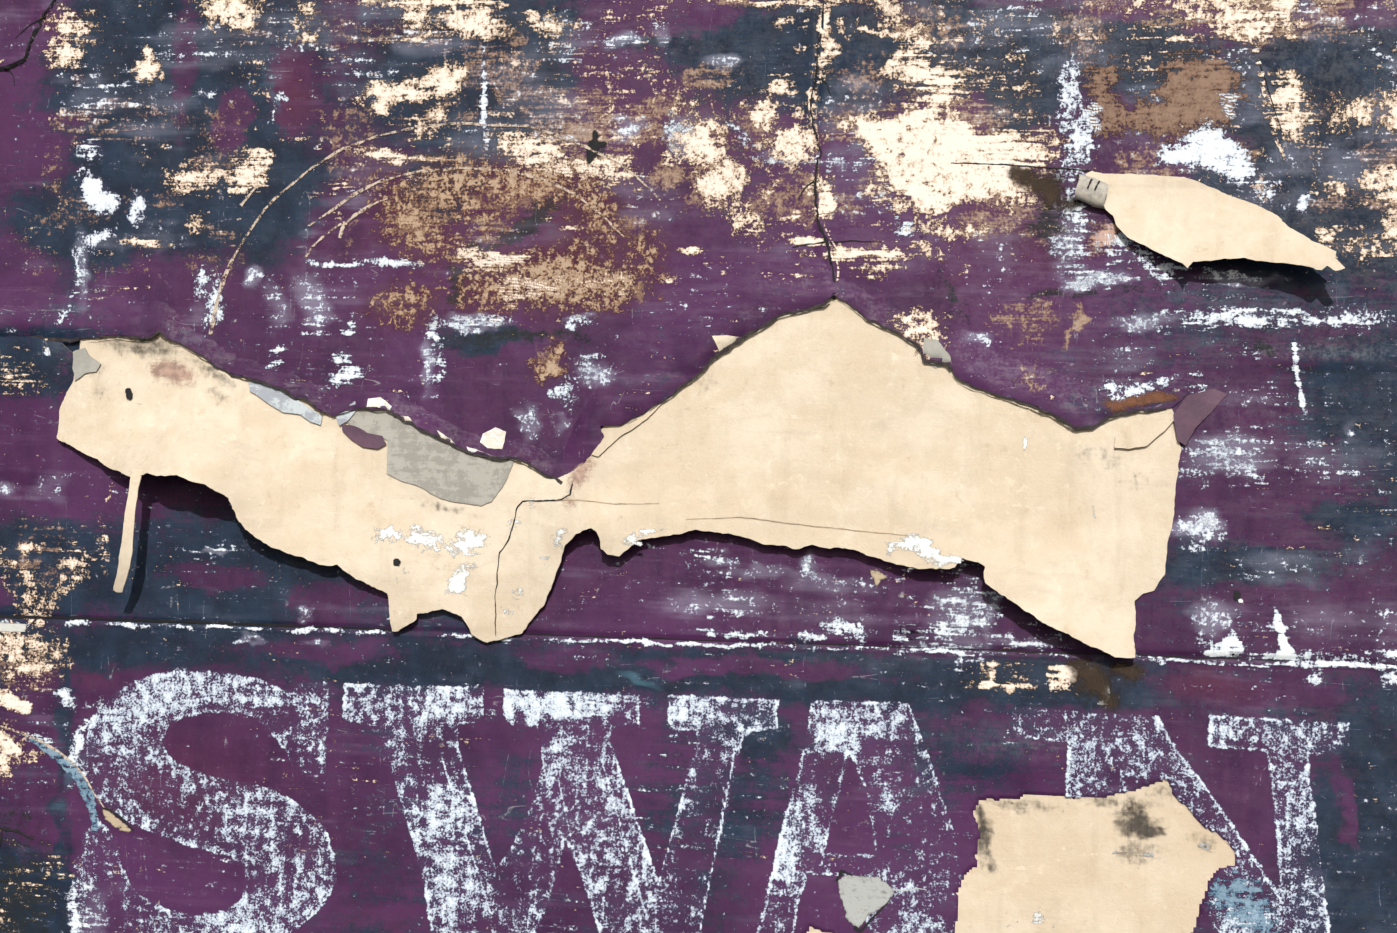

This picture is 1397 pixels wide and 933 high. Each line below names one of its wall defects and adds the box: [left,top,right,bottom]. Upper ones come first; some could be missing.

crack [0,0,54,86]
peeling [1091,0,1357,49]
crack [792,0,880,299]
peeling [1075,64,1397,271]
peeling [0,0,1227,658]
peeling [955,780,1235,933]